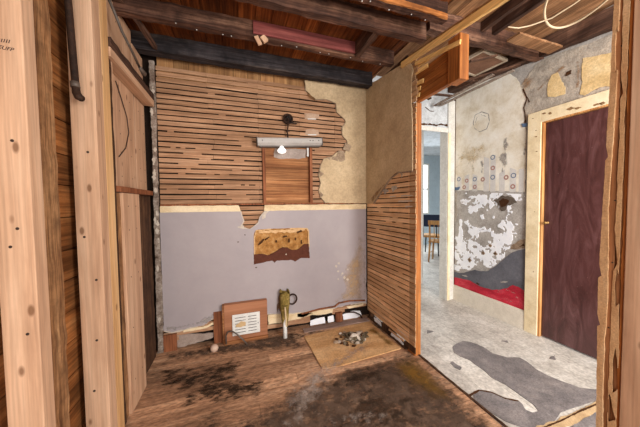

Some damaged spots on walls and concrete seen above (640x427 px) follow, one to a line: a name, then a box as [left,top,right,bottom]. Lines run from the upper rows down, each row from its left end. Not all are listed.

flaking render [521,34,612,119]
flaking render [304,81,351,203]
peeling [454,187,526,310]
peeling [268,308,334,326]
peeling [343,303,364,320]